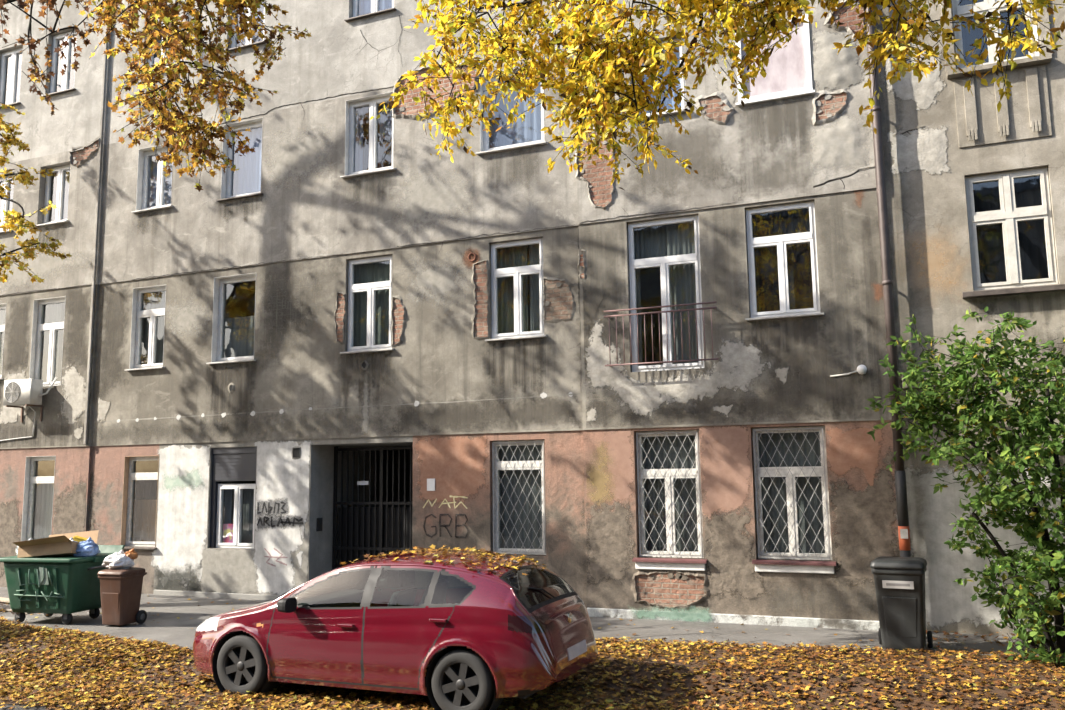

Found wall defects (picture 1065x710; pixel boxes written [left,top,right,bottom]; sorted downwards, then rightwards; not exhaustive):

spalling [824,0,866,44]
crack [215,15,411,125]
spalling [392,61,480,120]
flaking render [884,43,946,111]
spalling [574,127,617,210]
crack [813,165,875,195]
flaking render [887,126,951,175]
spalling [391,259,490,347]
damp [212,364,255,419]
damp [488,341,544,387]
peeling [151,444,210,589]
peeling [581,425,771,611]